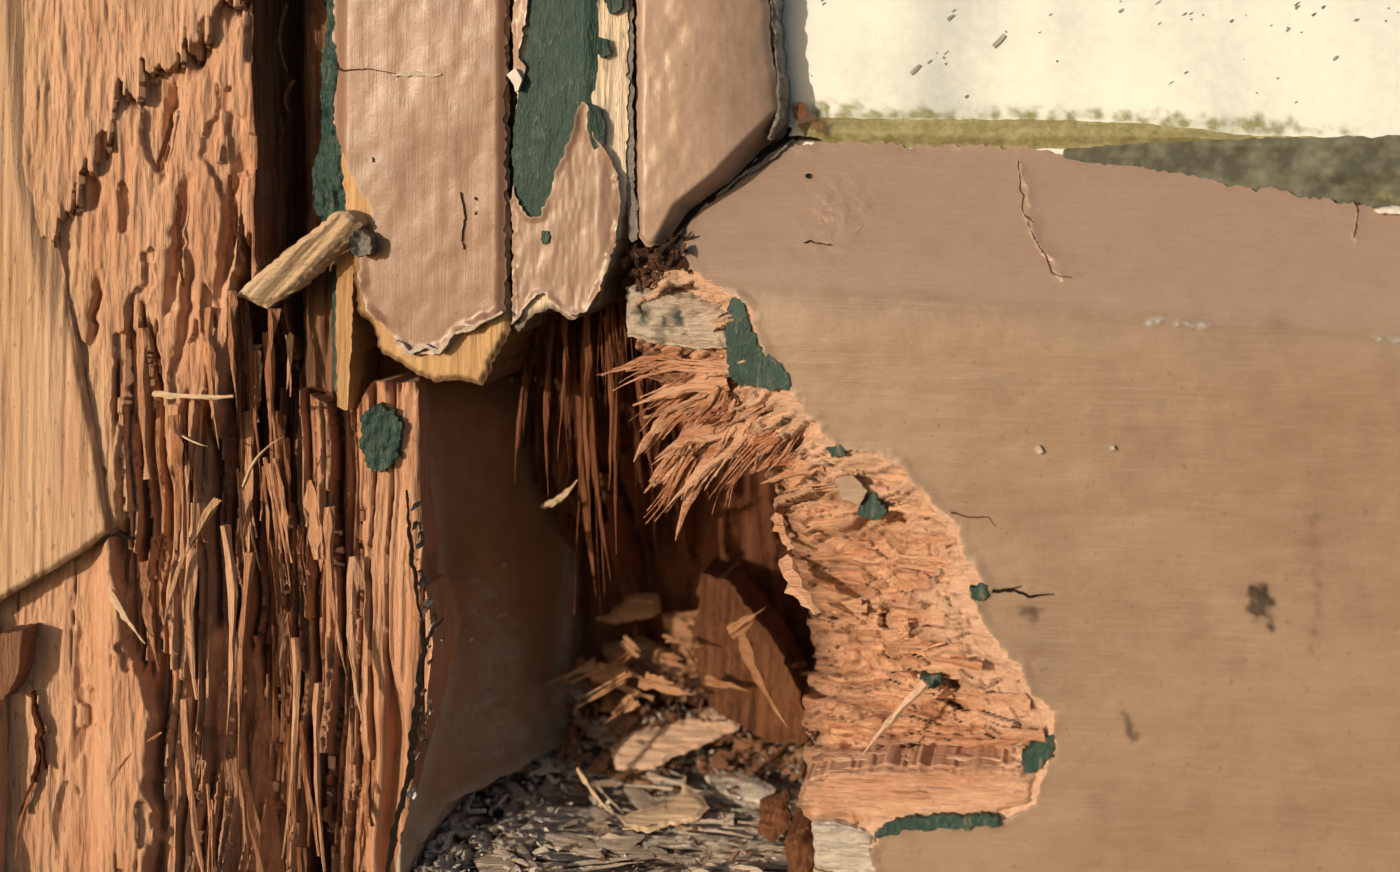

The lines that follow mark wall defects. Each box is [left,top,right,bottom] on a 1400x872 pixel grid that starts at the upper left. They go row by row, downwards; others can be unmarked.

peeling [604,0,624,15]
peeling [597,37,612,58]
peeling [587,104,607,149]
crack [156,113,185,286]
crack [227,175,246,267]
crack [1018,161,1072,278]
crack [1352,201,1360,239]
peeling [834,474,868,505]
crack [969,585,1054,598]
crack [18,690,48,816]